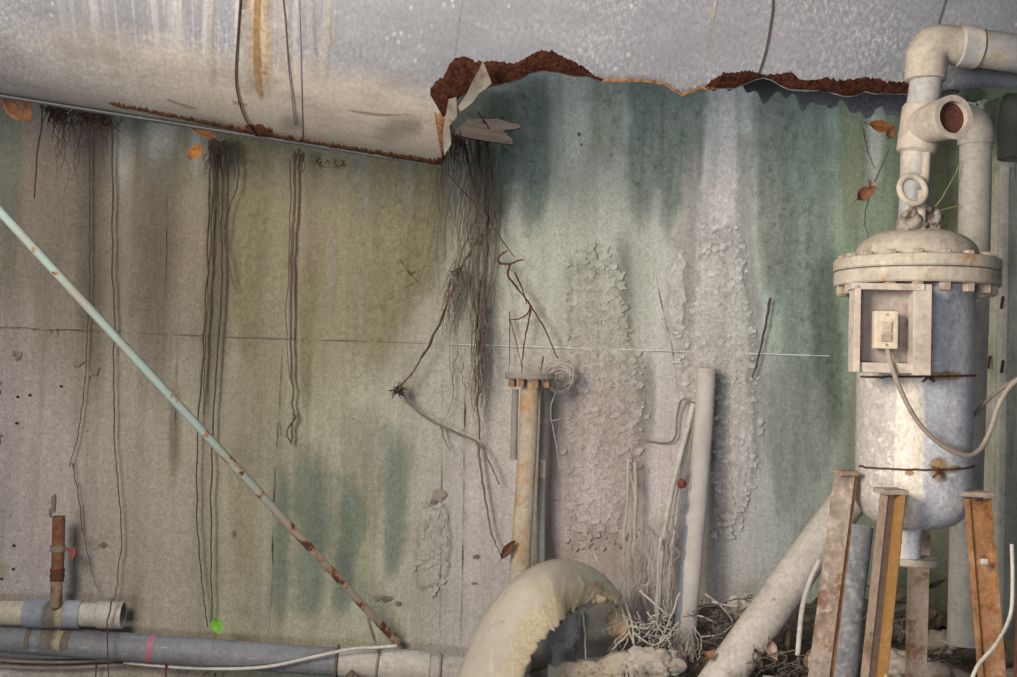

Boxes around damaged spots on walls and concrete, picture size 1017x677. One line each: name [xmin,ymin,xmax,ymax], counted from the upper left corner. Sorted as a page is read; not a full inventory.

corrosion [245,124,273,137]
damp [521,75,617,218]
damp [659,88,789,341]
damp [867,106,883,185]